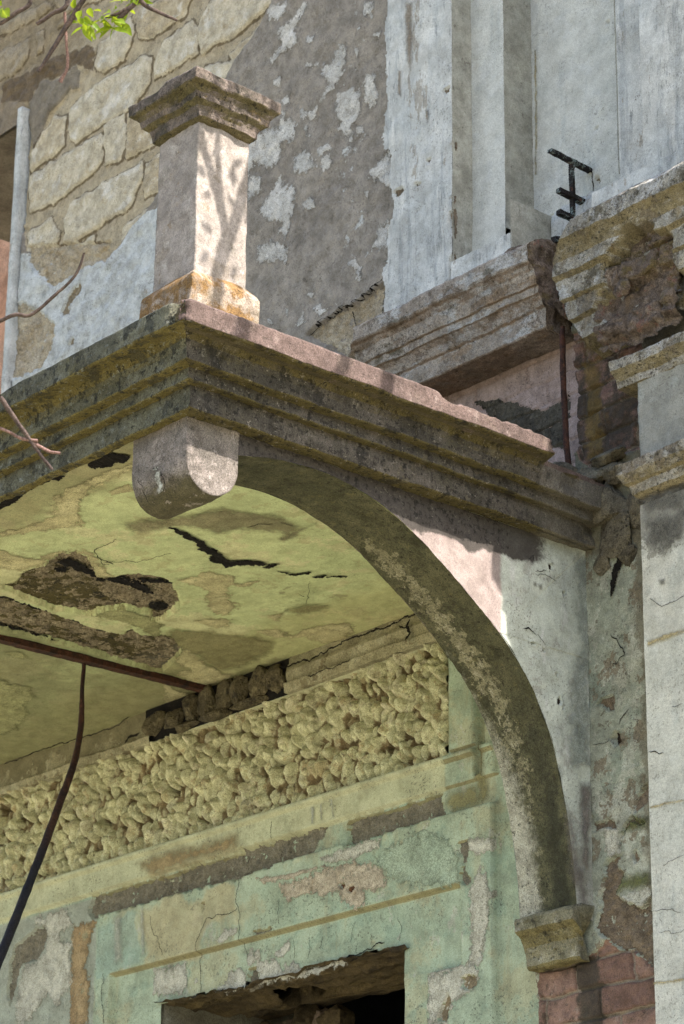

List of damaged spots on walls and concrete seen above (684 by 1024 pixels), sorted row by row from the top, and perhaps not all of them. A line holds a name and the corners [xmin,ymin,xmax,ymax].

peeling [267,0,314,64]
peeling [247,43,379,264]
peeling [364,150,404,198]
spalling [13,242,111,378]
spalling [285,287,385,357]
damp [474,391,572,450]
peeling [0,453,133,537]
crack [94,527,347,603]
spalling [553,446,645,576]
spalling [0,549,286,737]
spalling [9,796,502,1024]
spalling [594,785,654,965]